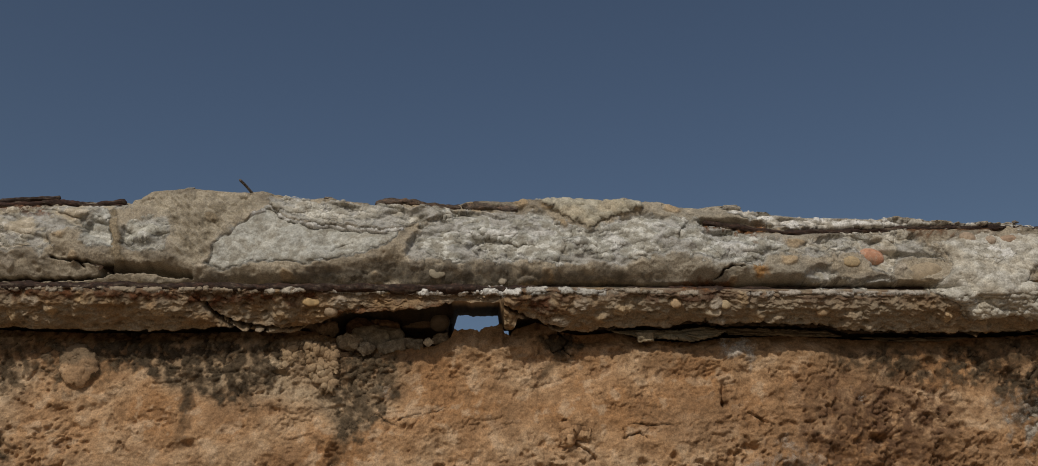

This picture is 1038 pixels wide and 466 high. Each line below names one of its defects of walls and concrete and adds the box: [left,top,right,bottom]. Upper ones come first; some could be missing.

corrosion [0,196,127,214]
corrosion [702,220,1038,237]
crack [2,256,114,282]
spalling [204,195,1038,322]
crack [206,301,274,331]
crack [597,319,1038,336]